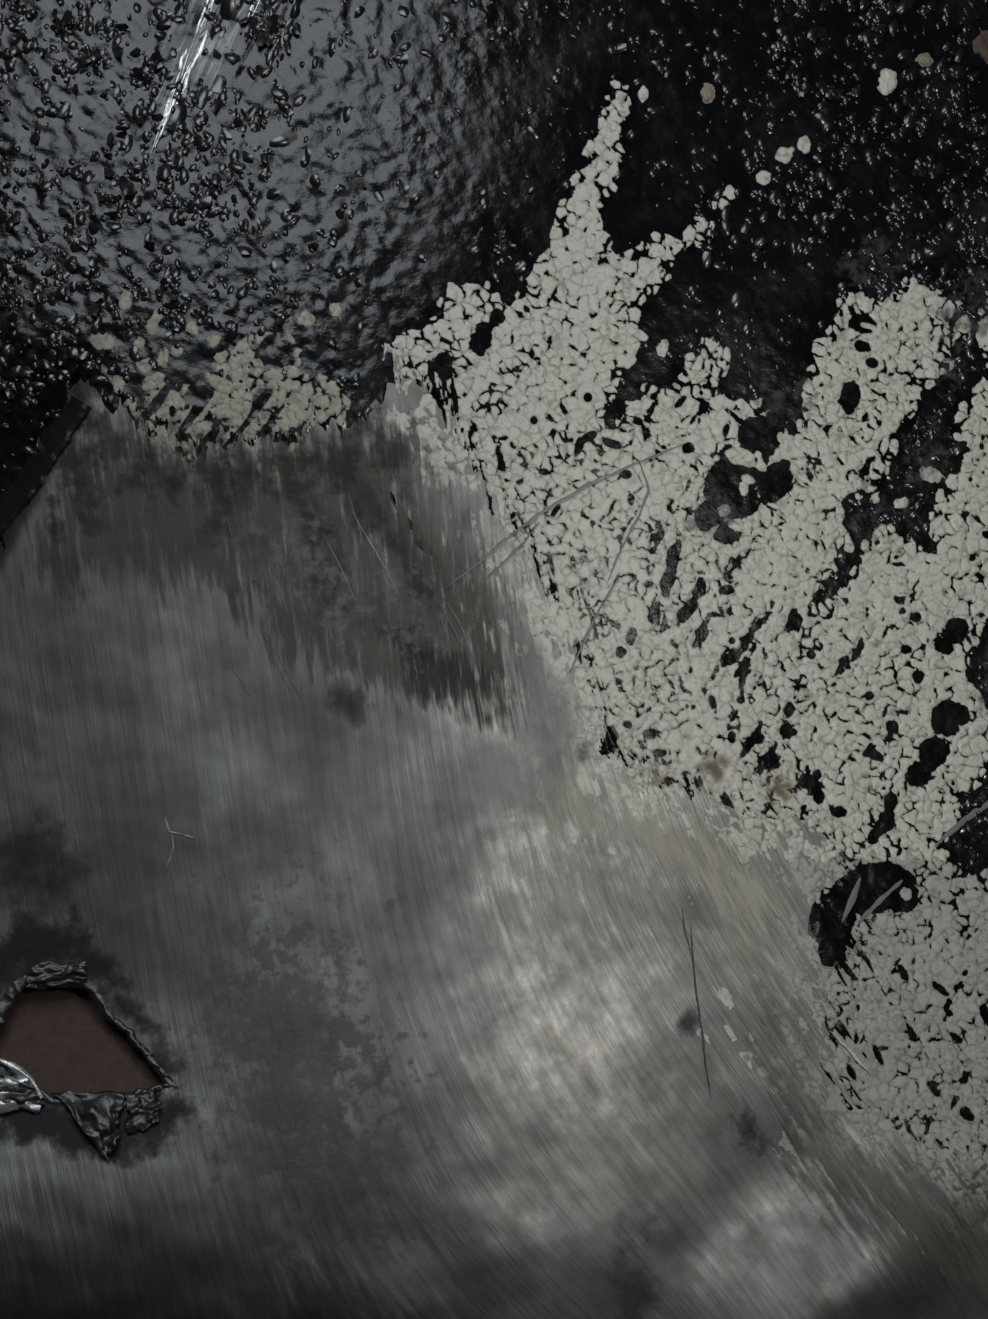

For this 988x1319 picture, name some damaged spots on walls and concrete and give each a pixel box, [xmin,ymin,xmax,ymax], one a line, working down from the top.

leakage [181,922,385,1181]